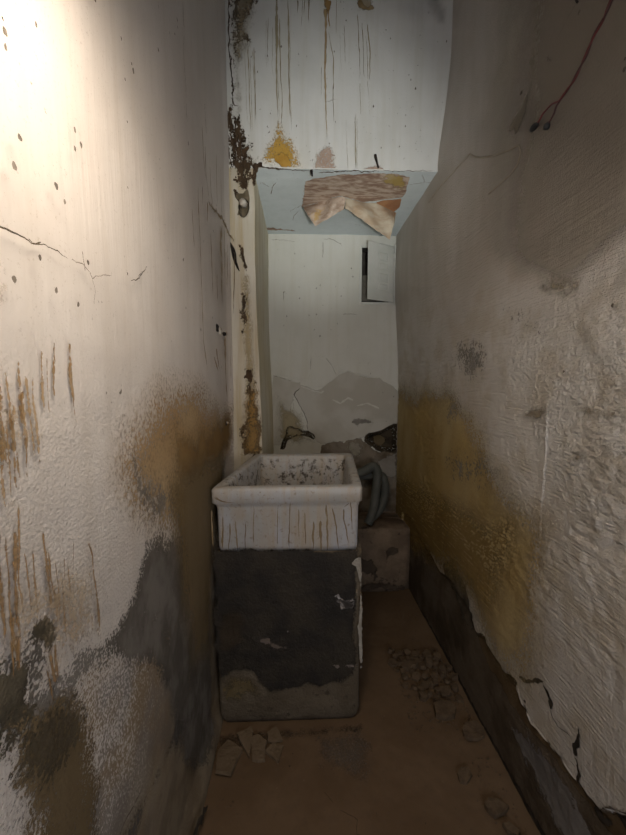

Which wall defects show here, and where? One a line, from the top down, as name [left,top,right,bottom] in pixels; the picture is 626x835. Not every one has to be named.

crack [0,226,110,299]
corrosion [0,343,55,507]
corrosion [68,344,76,420]
peeling [272,370,398,512]
water stain [30,616,57,652]
corrosion [0,508,100,699]
water stain [0,660,102,835]
water stain [396,390,542,673]
spalling [409,536,626,835]
crack [594,806,626,829]